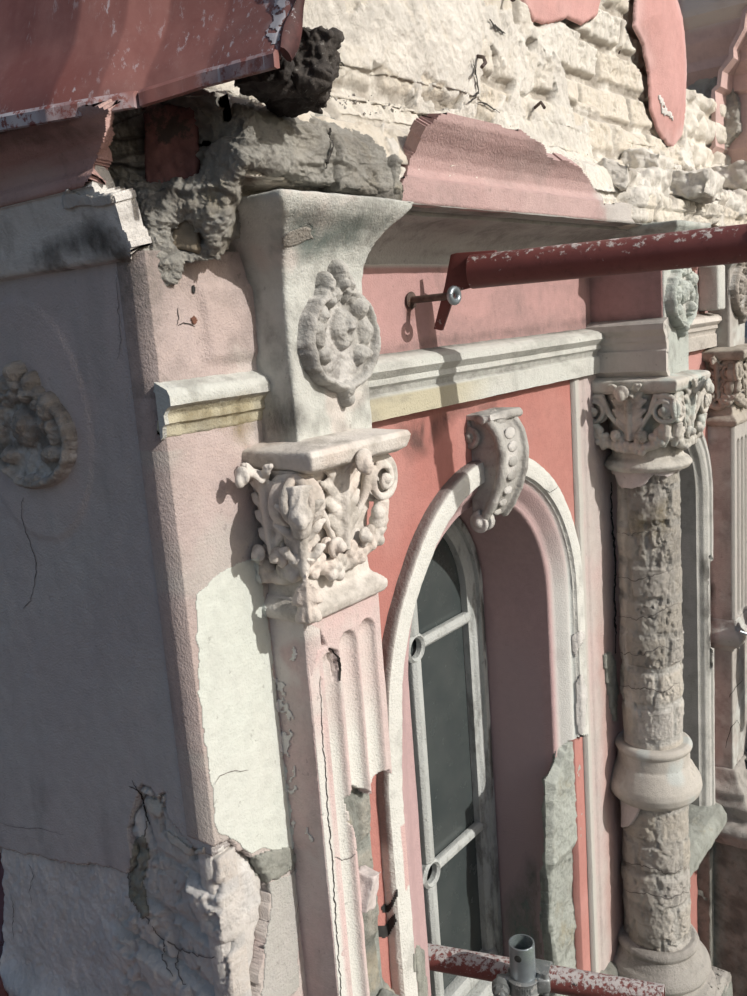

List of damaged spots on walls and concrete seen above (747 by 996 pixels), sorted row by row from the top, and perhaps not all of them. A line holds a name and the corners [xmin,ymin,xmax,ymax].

peeling [266,0,286,44]
peeling [658,95,673,121]
spalling [571,631,586,657]
crack [610,483,678,656]
spalling [0,785,296,996]
crack [127,781,214,985]
spalling [344,786,399,996]
spalling [413,945,428,996]
spalling [539,674,588,969]